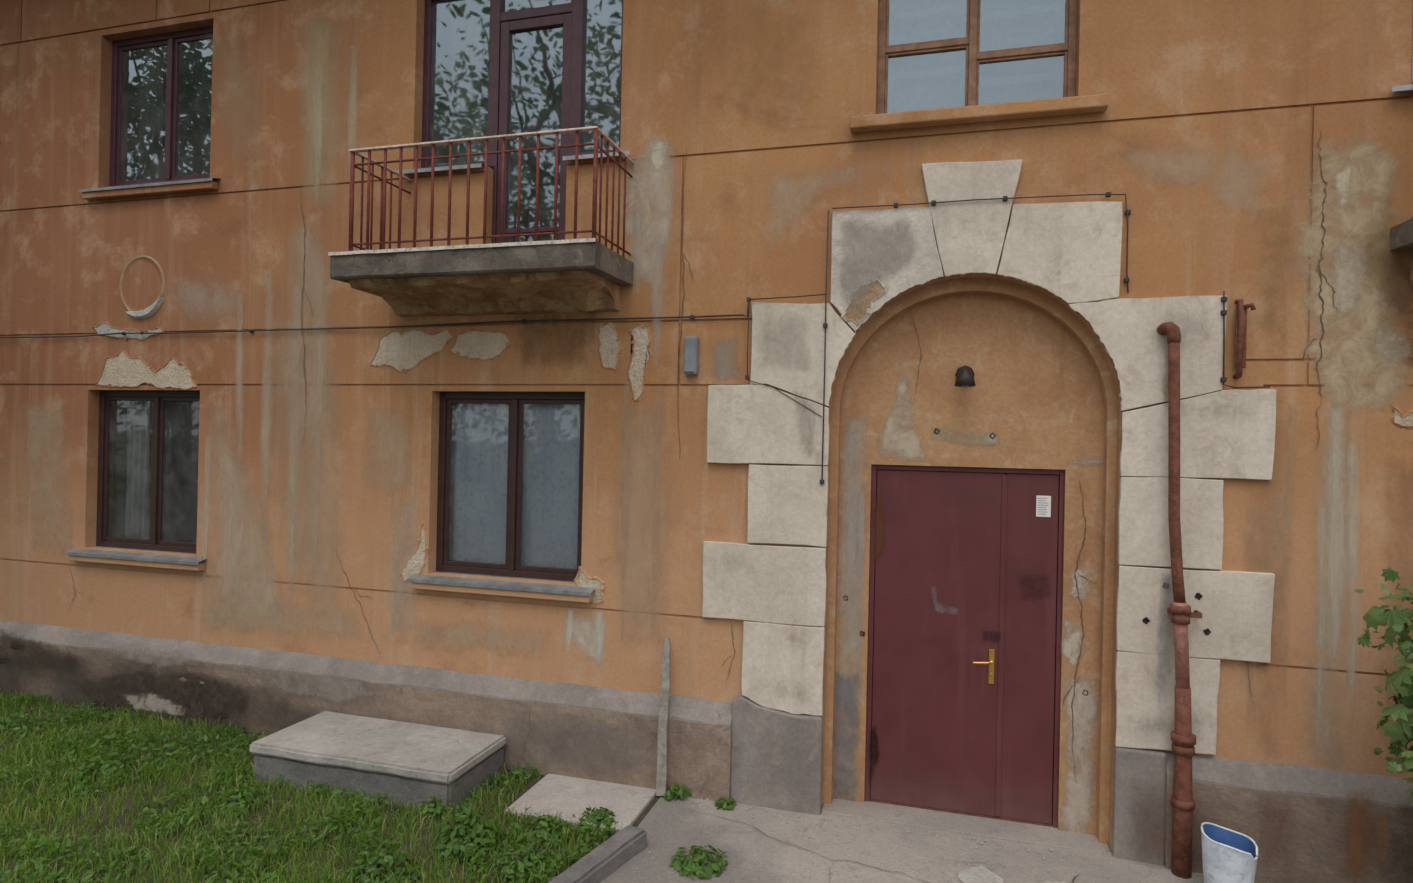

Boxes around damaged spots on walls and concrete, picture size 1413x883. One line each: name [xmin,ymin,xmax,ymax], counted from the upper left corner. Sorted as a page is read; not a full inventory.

peeling [650,140,667,171]
peeling [1334,165,1354,207]
crack [1301,131,1336,449]
peeling [92,321,198,391]
peeling [370,327,513,373]
peeling [597,321,653,402]
damp [1296,143,1413,752]
peeling [1389,404,1413,430]
crack [1063,481,1097,782]